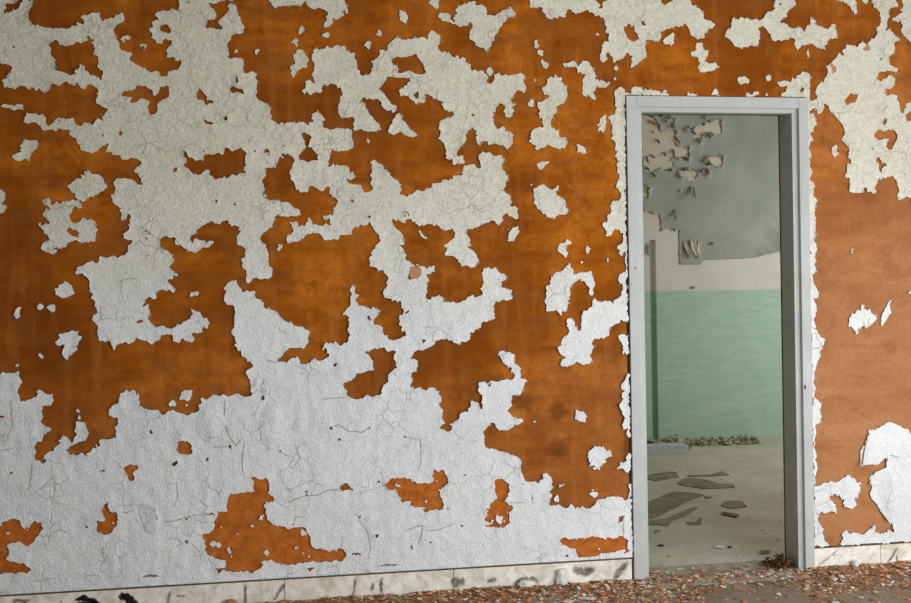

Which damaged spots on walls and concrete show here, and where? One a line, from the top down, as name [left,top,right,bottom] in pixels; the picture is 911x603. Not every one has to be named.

peeling [725,0,838,59]
peeling [737,76,768,97]
peeling [642,115,780,265]
peeling [0,0,720,595]
peeling [766,0,911,548]
crack [1,408,33,489]
crack [215,401,245,473]
crack [164,482,196,546]
crack [285,489,341,524]